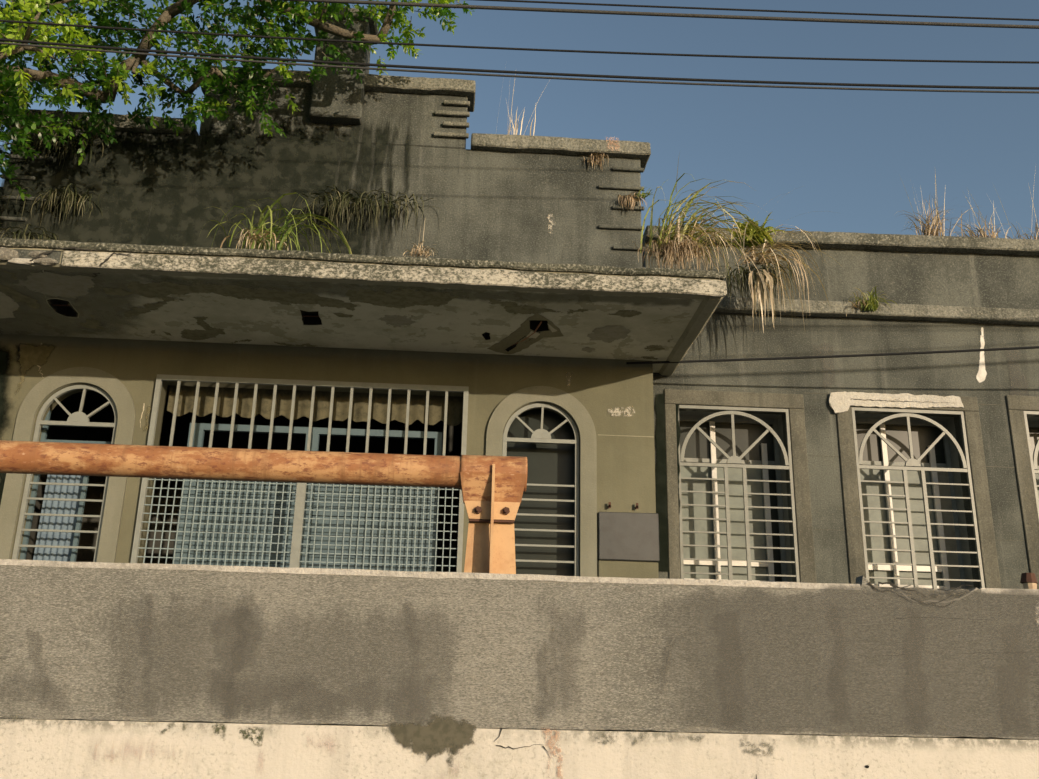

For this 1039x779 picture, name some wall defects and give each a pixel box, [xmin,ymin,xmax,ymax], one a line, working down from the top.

peeling [0,247,461,327]
peeling [151,317,225,340]
spalling [482,299,588,354]
peeling [582,310,642,353]
water stain [976,327,987,383]